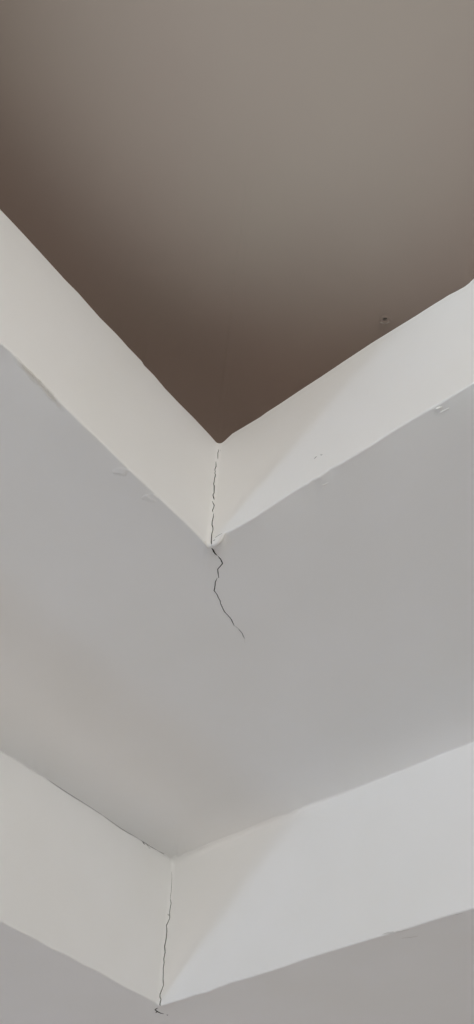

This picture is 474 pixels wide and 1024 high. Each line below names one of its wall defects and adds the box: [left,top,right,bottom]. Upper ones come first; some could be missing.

crack [211,450,245,639]
crack [155,883,172,1014]